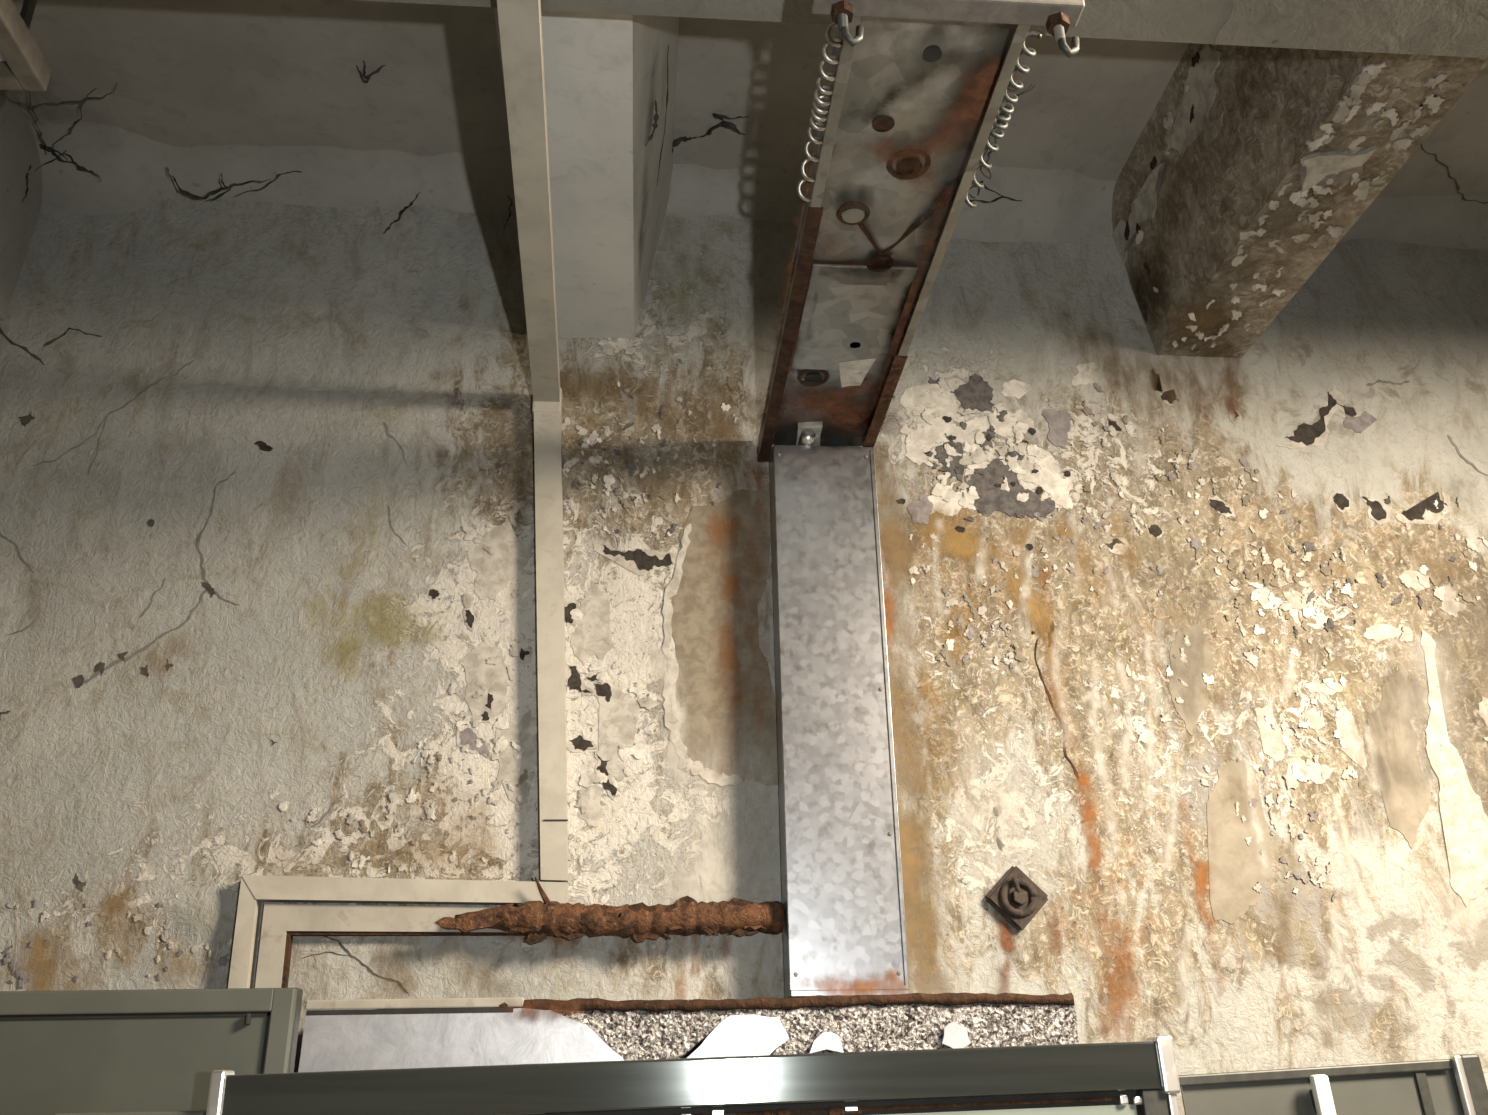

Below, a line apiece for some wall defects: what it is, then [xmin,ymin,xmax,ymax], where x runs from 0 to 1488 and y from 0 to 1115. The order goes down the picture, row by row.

peeling [1112,44,1223,292]
peeling [1172,61,1450,350]
peeling [721,376,738,425]
spalling [562,391,779,827]
leakage [677,826,746,903]
rust [492,445,1074,1018]
leakage [1022,557,1031,599]
rust [1079,775,1101,867]
leakage [1083,663,1105,776]
leakage [1117,661,1153,789]
peeling [892,362,1488,924]
leakage [1414,631,1488,922]